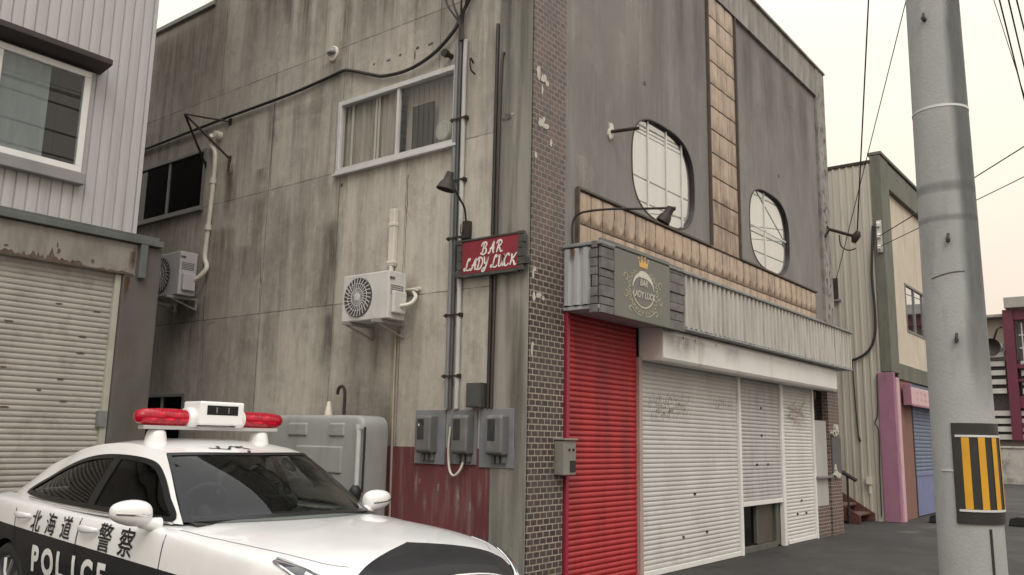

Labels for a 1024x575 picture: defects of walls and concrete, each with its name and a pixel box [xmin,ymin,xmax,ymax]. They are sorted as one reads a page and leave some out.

peeling [537,66,549,95]
peeling [0,242,133,275]